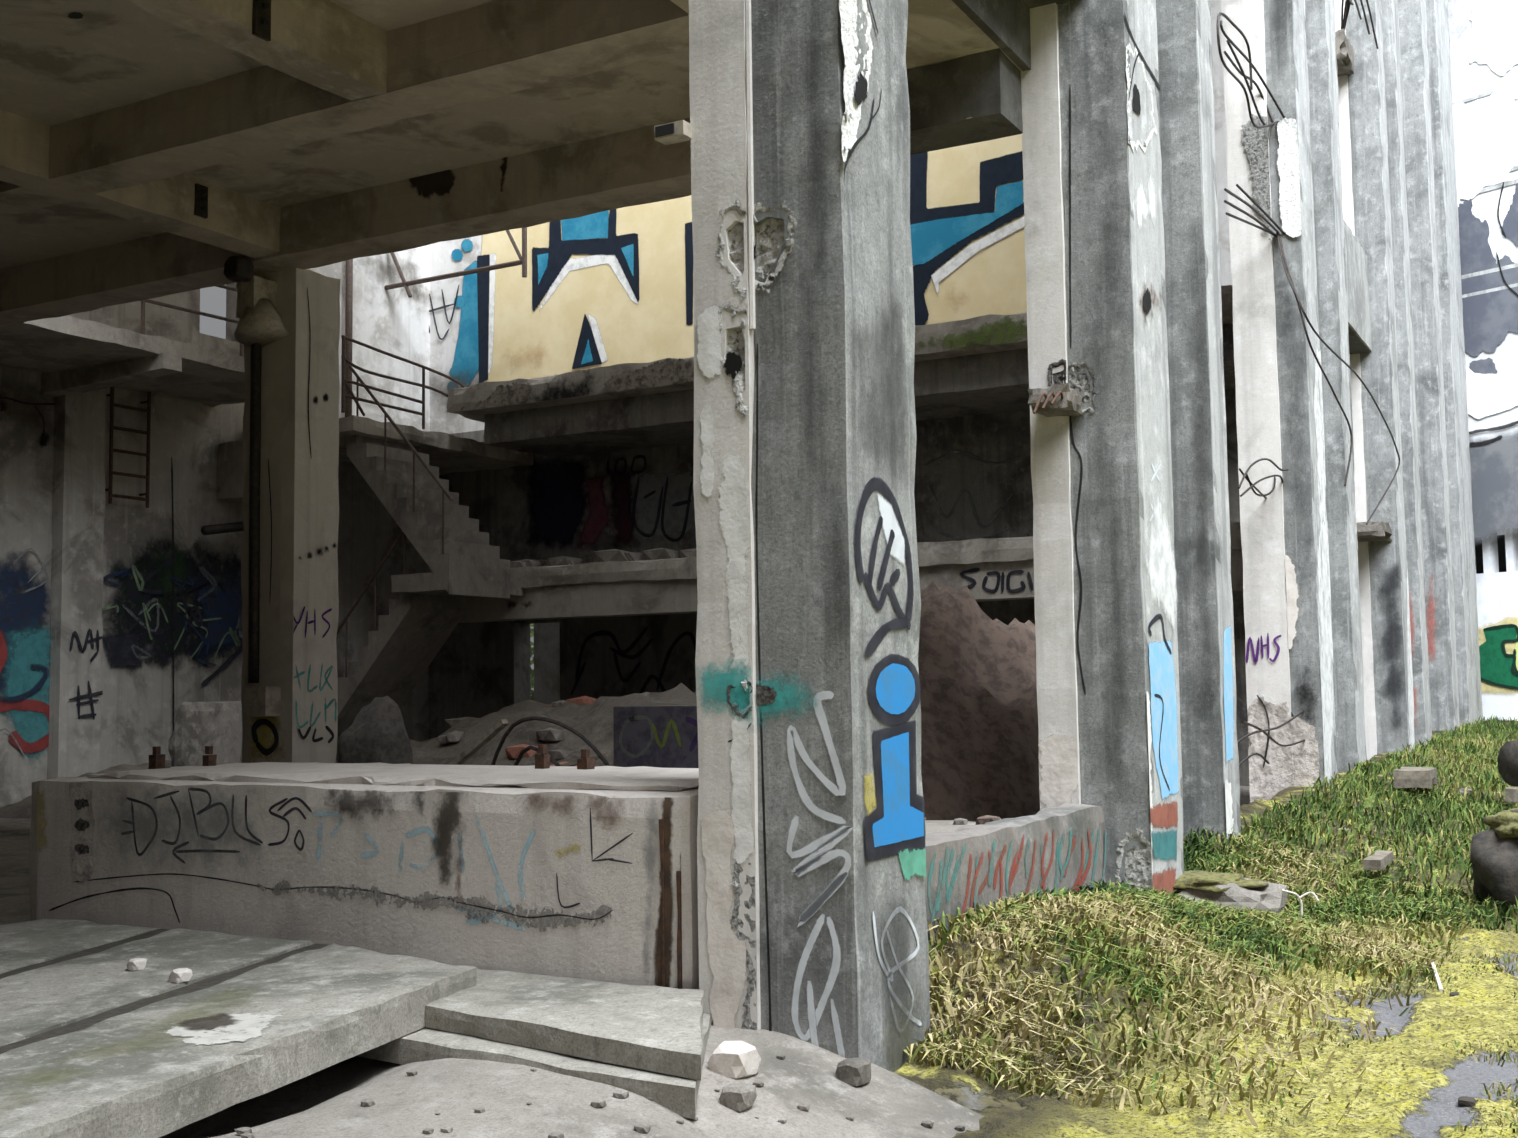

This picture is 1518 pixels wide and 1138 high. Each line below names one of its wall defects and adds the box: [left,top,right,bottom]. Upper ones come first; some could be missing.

spalling [604,200,798,417]
spalling [1216,12,1400,525]
spalling [461,383,530,411]
peeling [1285,555,1299,649]
water stain [329,789,392,817]
water stain [415,791,460,883]
rust [654,797,682,989]
peeling [699,407,777,1030]
spalling [1225,695,1322,839]